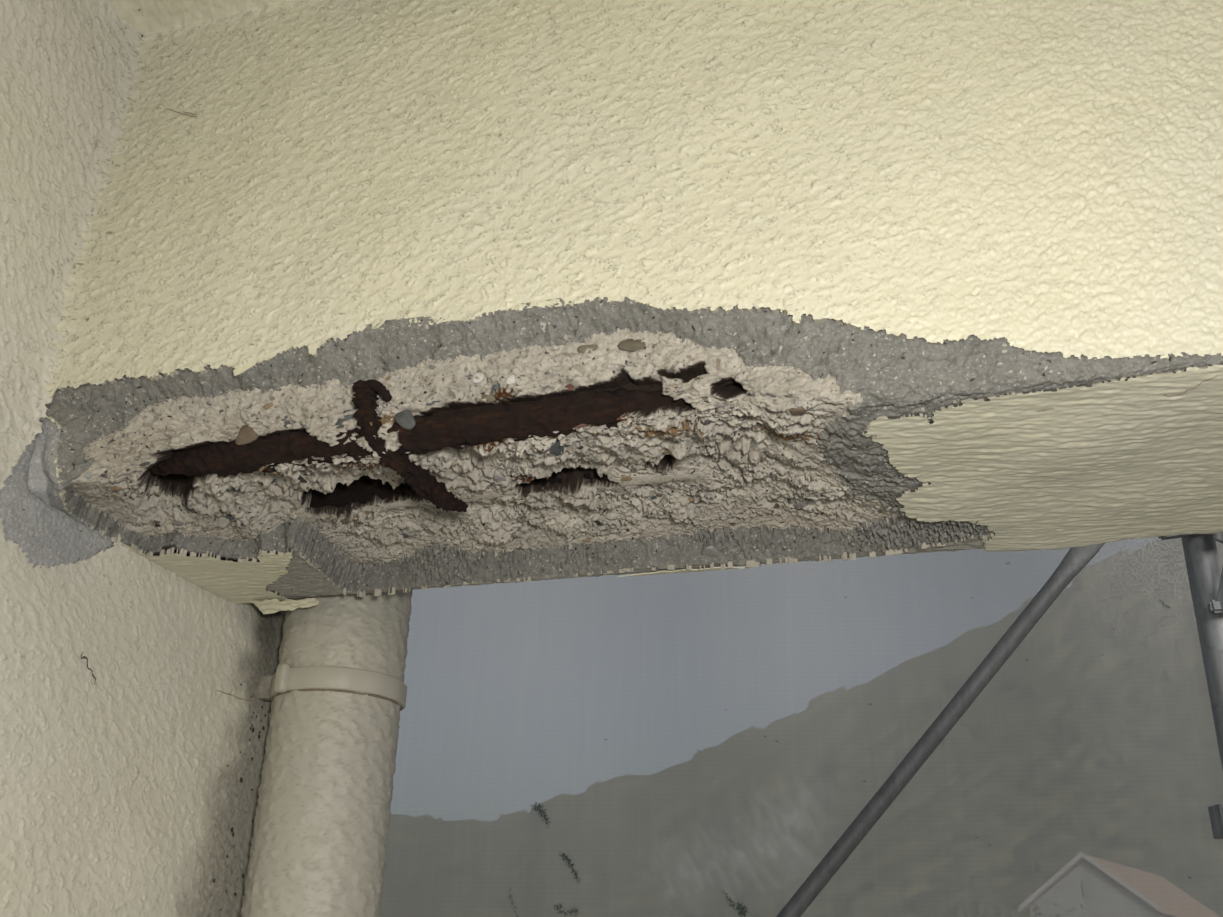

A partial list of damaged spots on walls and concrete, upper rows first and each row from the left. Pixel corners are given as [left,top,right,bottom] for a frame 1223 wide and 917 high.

spalling [0,297,1223,614]